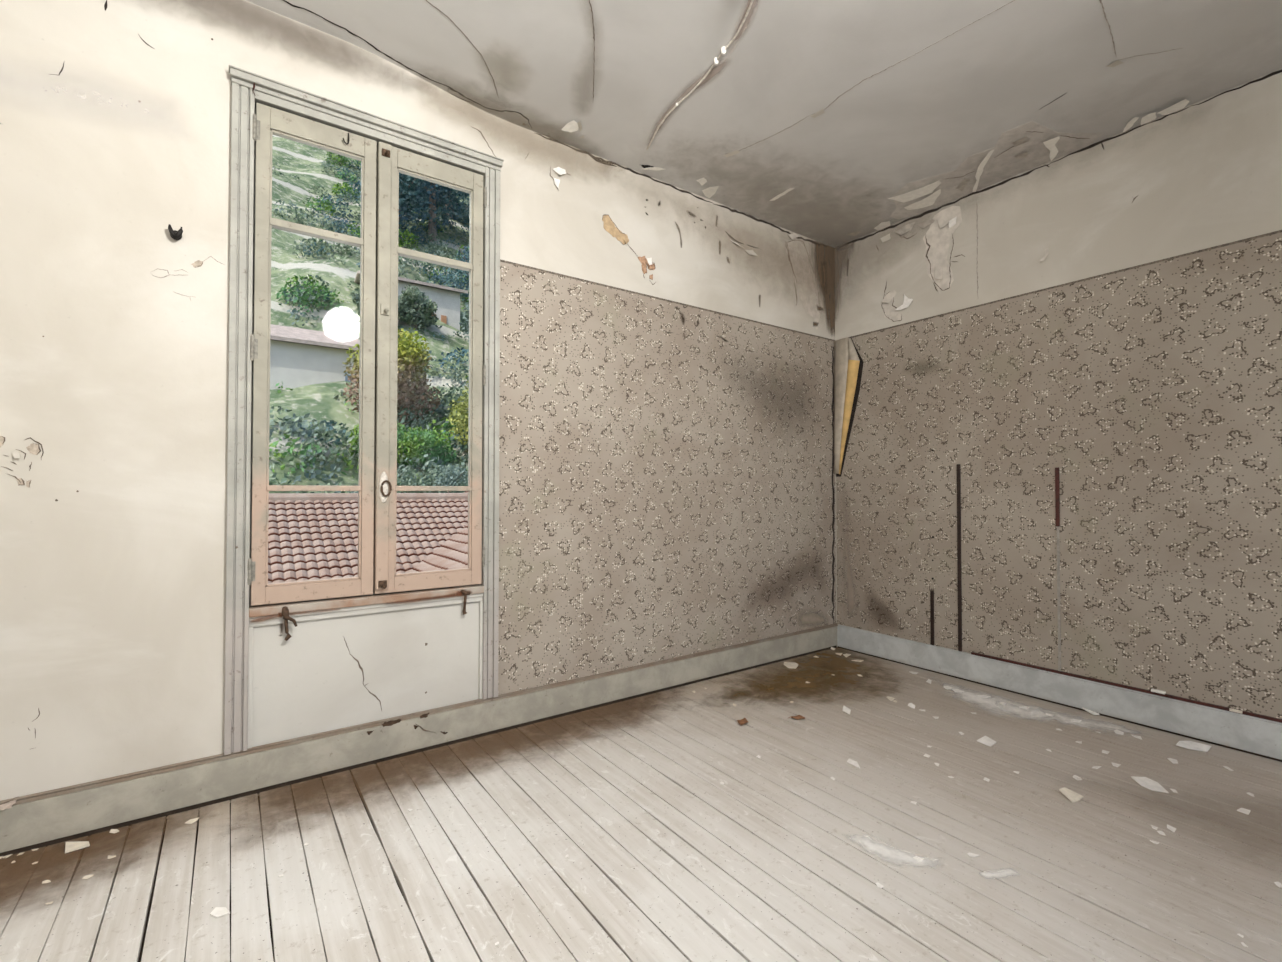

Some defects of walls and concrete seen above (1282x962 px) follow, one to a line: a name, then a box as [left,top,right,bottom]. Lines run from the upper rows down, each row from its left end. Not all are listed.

crack [283,0,1282,296]
peeling [1123,99,1189,132]
spalling [602,214,656,285]
spalling [847,206,965,294]
spalling [0,436,44,488]
crack [344,638,382,710]
damp [724,647,887,702]